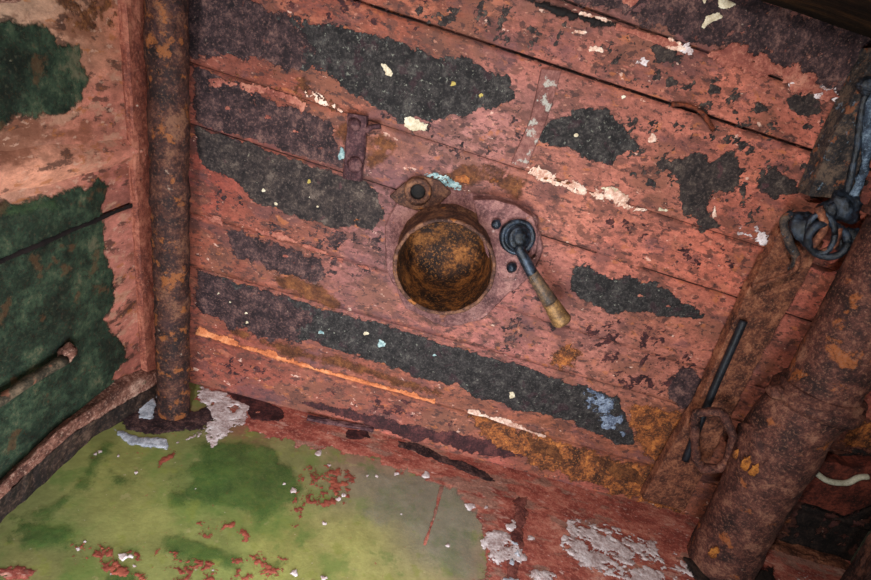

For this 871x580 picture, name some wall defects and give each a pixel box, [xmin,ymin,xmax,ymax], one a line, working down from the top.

peeling [573,0,871,116]
peeling [188,0,515,232]
peeling [539,107,656,166]
rust [626,117,679,193]
rust [668,85,755,160]
rust [710,155,789,225]
rust [195,326,441,420]
rust [461,218,824,514]
rust [844,420,871,449]
peeling [155,386,700,580]
peeling [70,540,153,580]
peeling [761,539,851,580]